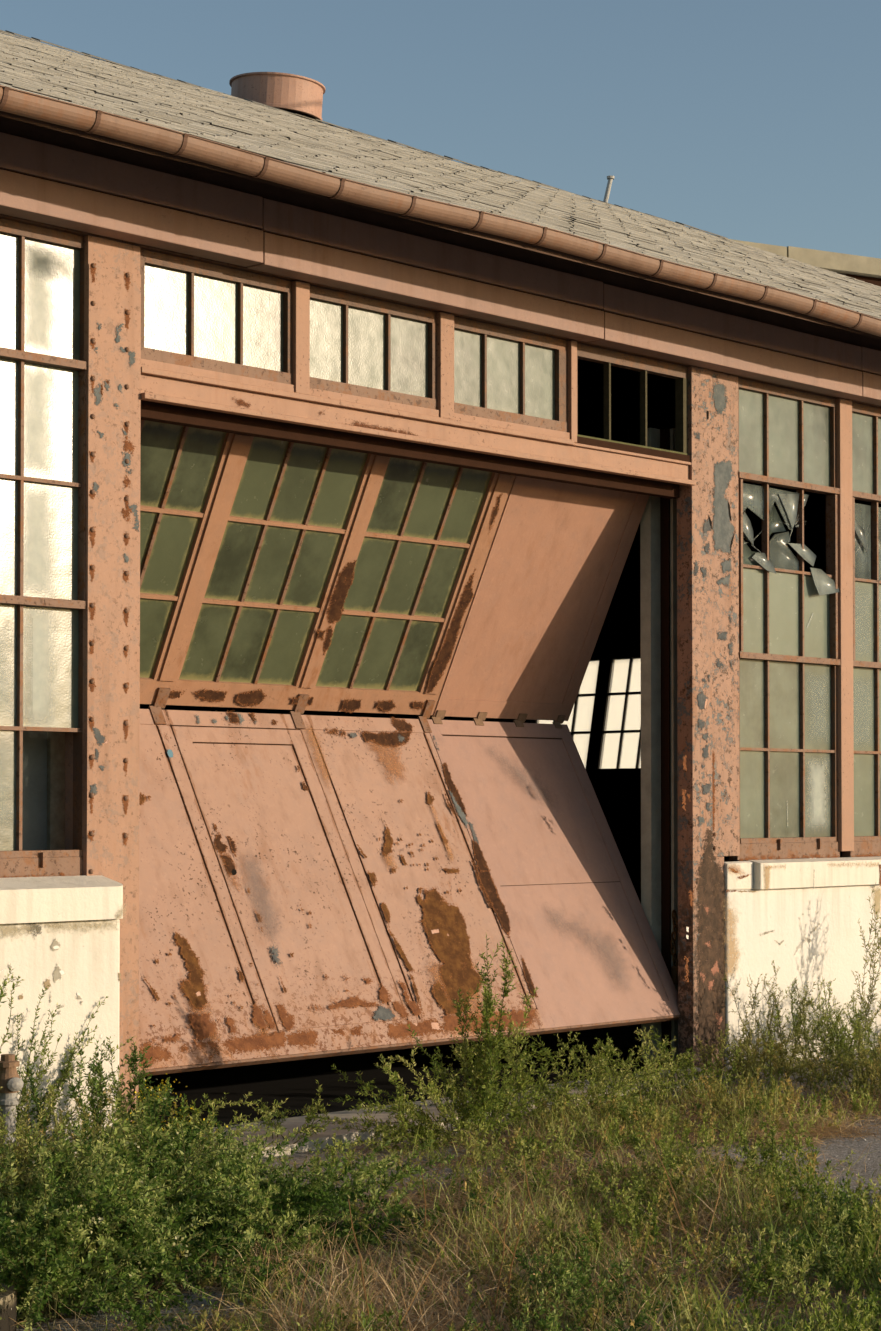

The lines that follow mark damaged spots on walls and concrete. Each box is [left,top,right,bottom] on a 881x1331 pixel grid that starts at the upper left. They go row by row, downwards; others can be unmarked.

peeling [96,320,136,368]
peeling [93,379,124,409]
peeling [707,381,729,419]
peeling [122,426,136,488]
peeling [121,504,140,531]
rust [488,493,503,533]
peeling [694,459,734,587]
rust [317,560,357,656]
rust [169,687,267,708]
rust [325,569,476,783]
peeling [90,727,108,795]
rust [139,736,539,1068]